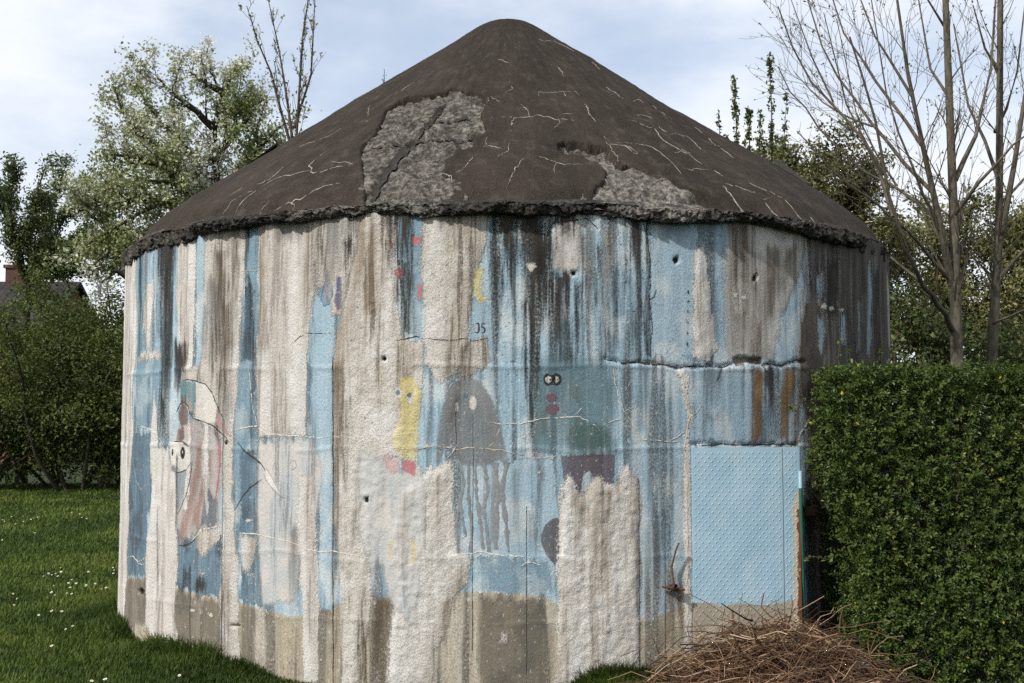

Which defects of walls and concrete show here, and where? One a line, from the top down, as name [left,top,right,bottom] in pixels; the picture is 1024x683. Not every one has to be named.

crack [224,129,352,214]
crack [442,39,814,221]
spalling [558,147,703,210]
leakage [156,238,188,421]
peeling [145,91,489,683]
leakage [385,213,418,331]
crack [231,218,808,650]
leakage [489,213,651,427]
rust [751,365,763,444]
rust [780,367,801,437]
leakage [767,237,894,641]
peeling [552,464,643,683]